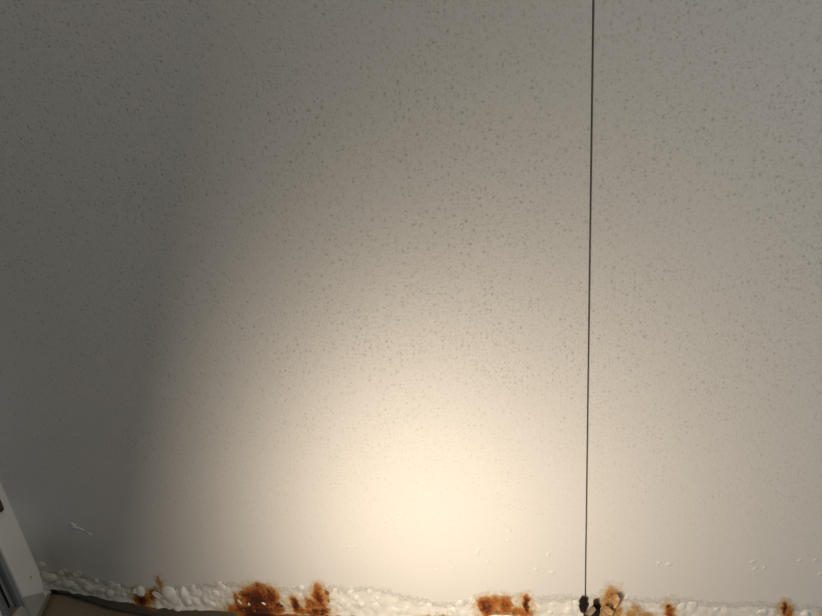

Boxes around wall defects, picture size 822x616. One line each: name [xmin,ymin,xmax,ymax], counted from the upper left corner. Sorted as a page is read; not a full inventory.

corrosion [132,577,163,610]
corrosion [225,582,330,616]
corrosion [476,594,534,616]
corrosion [599,587,652,616]
corrosion [660,603,677,616]
corrosion [777,599,793,616]